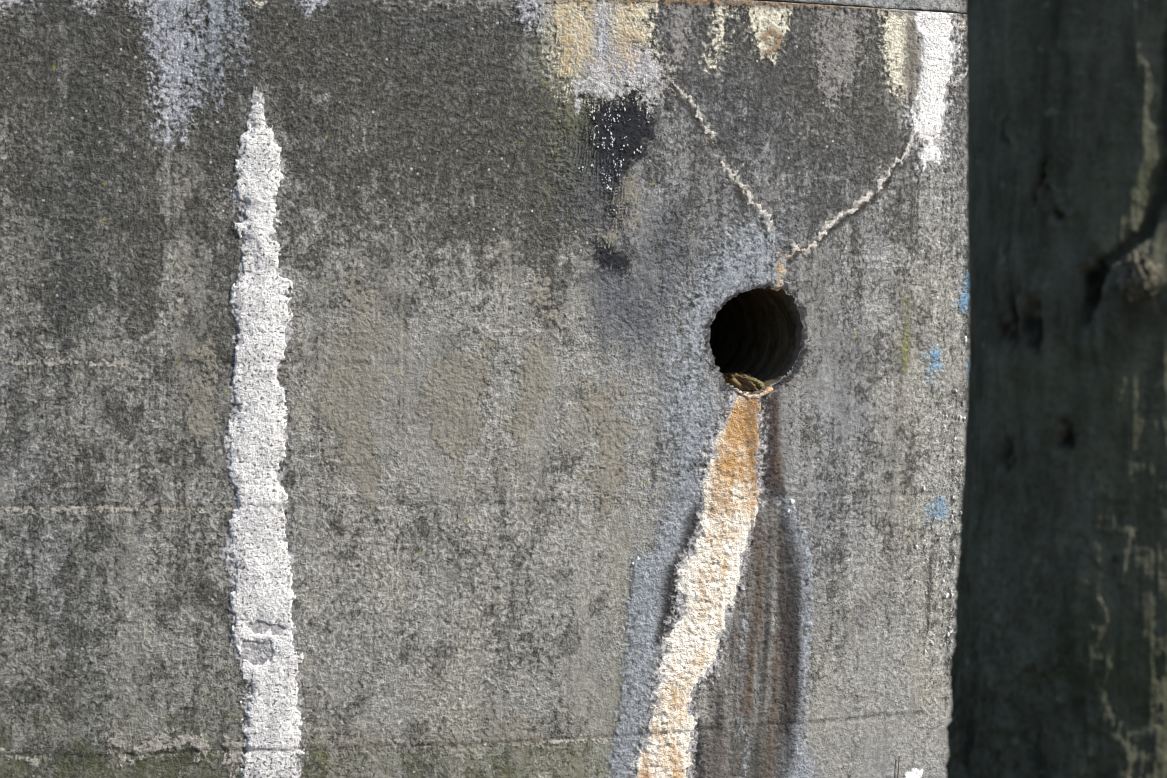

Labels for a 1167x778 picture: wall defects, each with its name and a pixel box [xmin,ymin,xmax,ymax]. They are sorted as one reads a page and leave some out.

leakage [136,0,308,778]
leakage [511,0,967,778]
crack [668,77,917,291]
crack [947,67,968,87]